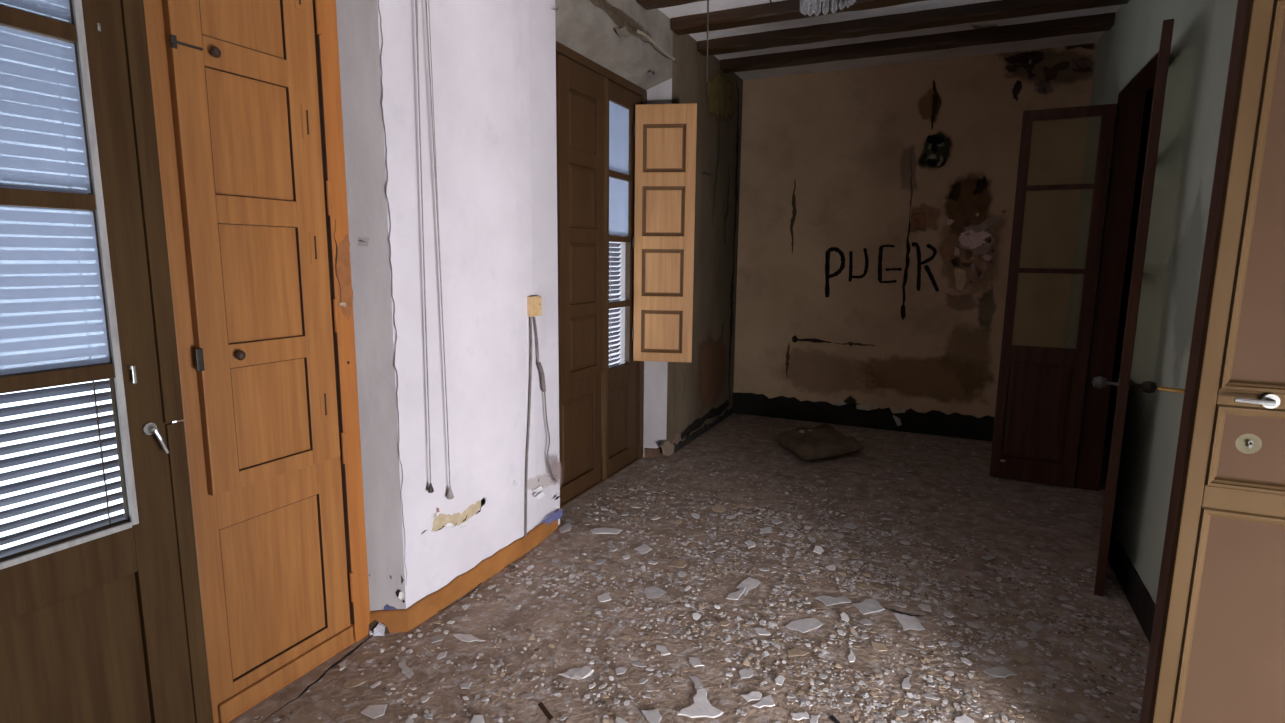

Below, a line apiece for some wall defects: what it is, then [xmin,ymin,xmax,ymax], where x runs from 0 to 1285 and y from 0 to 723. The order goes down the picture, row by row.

flaking render [590,0,649,38]
flaking render [1003,43,1095,102]
crack [789,180,797,253]
flaking render [912,175,1007,294]
flaking render [422,497,486,534]